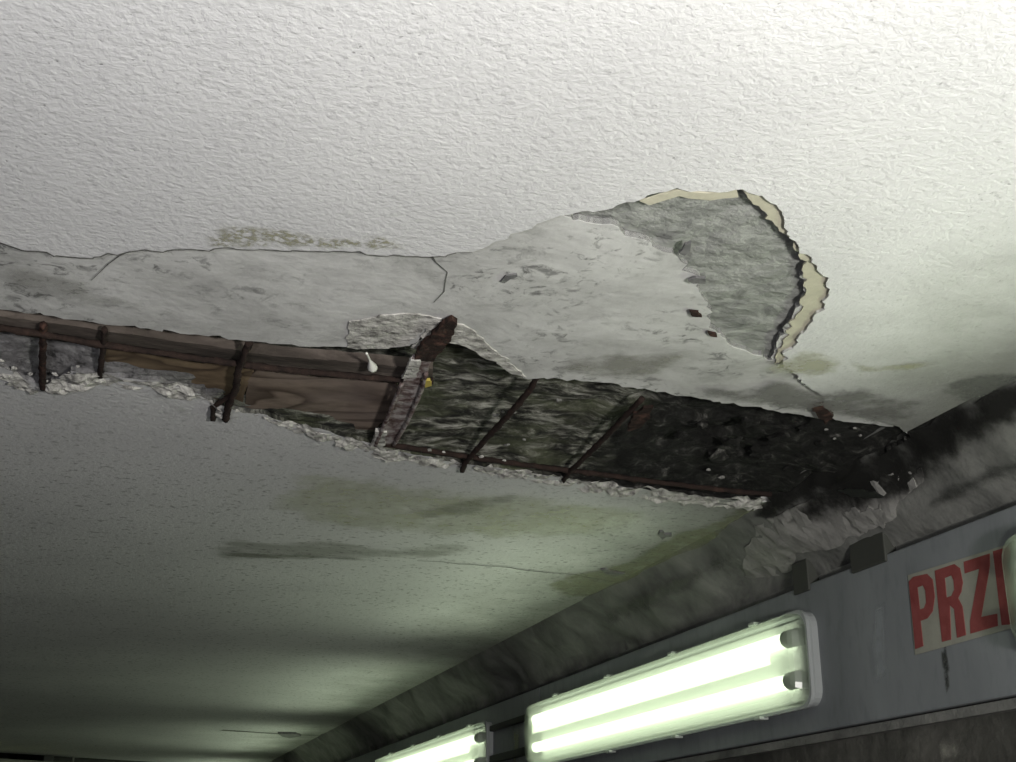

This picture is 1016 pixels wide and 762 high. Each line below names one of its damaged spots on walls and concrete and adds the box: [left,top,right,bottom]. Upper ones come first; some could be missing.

crack [0,243,456,302]
peeling [0,188,934,579]
water stain [711,383,908,419]
water stain [756,458,859,518]